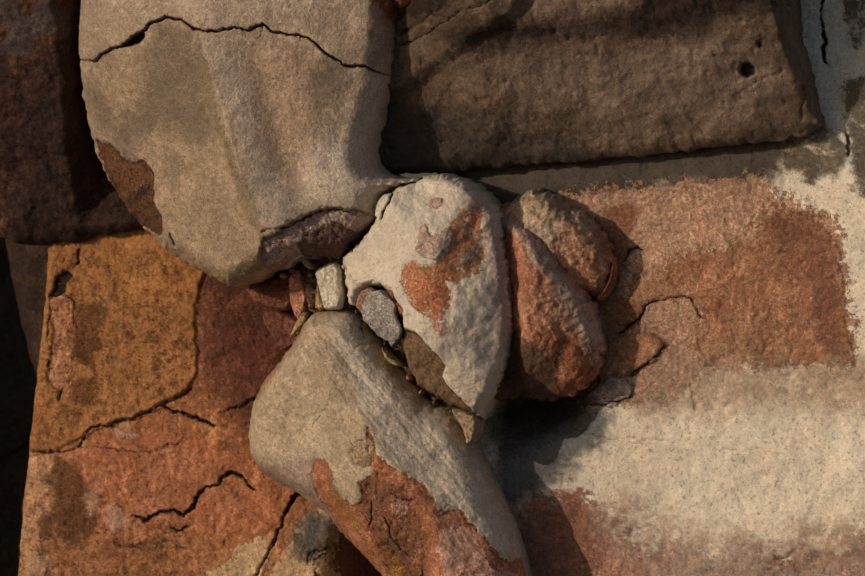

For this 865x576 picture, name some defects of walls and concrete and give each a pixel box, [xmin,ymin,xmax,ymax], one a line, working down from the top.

crack [402,0,490,45]
crack [820,0,828,64]
crack [843,134,851,154]
crack [620,296,701,333]
crack [33,388,256,454]
crack [115,471,254,549]
crack [257,493,300,575]